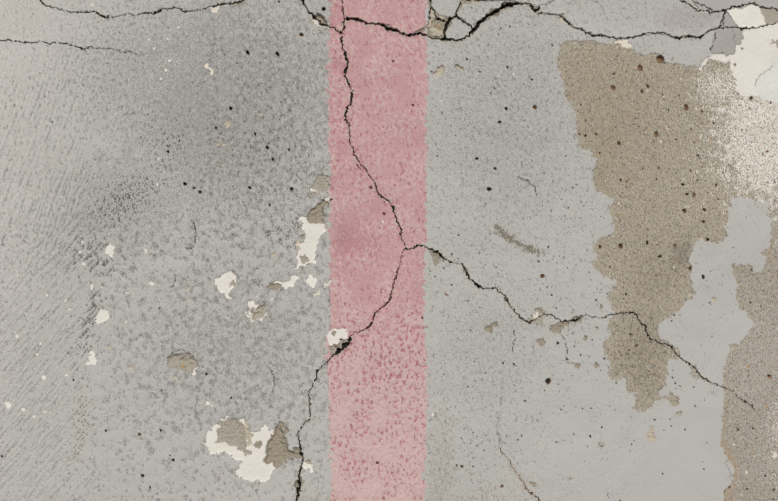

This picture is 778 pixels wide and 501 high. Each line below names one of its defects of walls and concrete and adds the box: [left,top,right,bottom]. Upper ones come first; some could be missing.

crack [40,0,246,18]
crack [7,39,175,56]
peeling [267,217,330,297]
crack [296,0,777,501]
peeling [557,11,778,501]
peeling [327,328,353,355]
peeling [205,416,314,482]